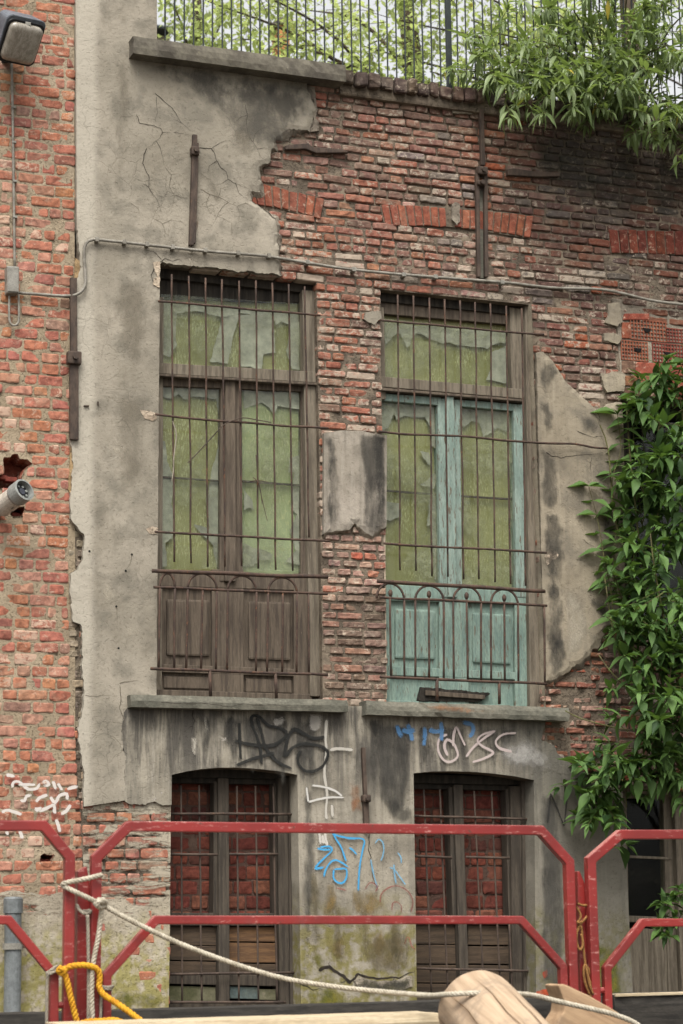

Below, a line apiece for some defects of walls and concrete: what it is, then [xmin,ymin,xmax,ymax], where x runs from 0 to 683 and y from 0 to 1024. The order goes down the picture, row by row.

spalling [251,85,319,200]
crack [123,93,267,282]
spalling [450,202,460,226]
hole [0,454,31,489]
damp [362,436,384,528]
damp [372,924,408,968]
crack [301,962,411,990]
damp [359,979,409,991]